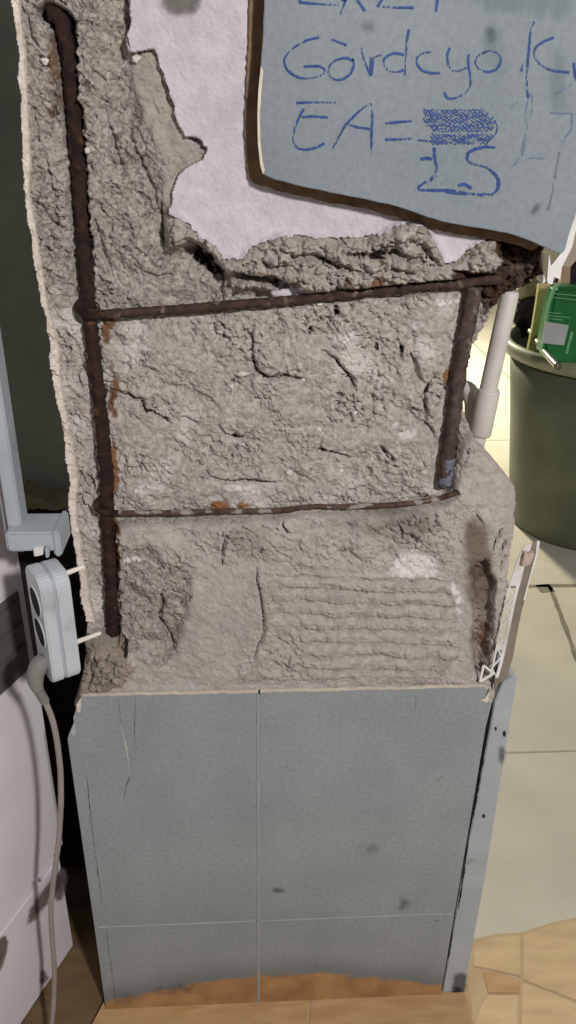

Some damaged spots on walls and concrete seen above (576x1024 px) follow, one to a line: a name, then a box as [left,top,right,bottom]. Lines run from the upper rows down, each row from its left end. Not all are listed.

rust [47,36,64,116]
rust [101,318,115,344]
spalling [19,0,516,702]
crack [251,331,301,379]
rust [107,373,119,418]
crack [208,473,279,483]
rust [211,501,251,509]
crack [254,573,264,658]
crack [119,698,136,798]